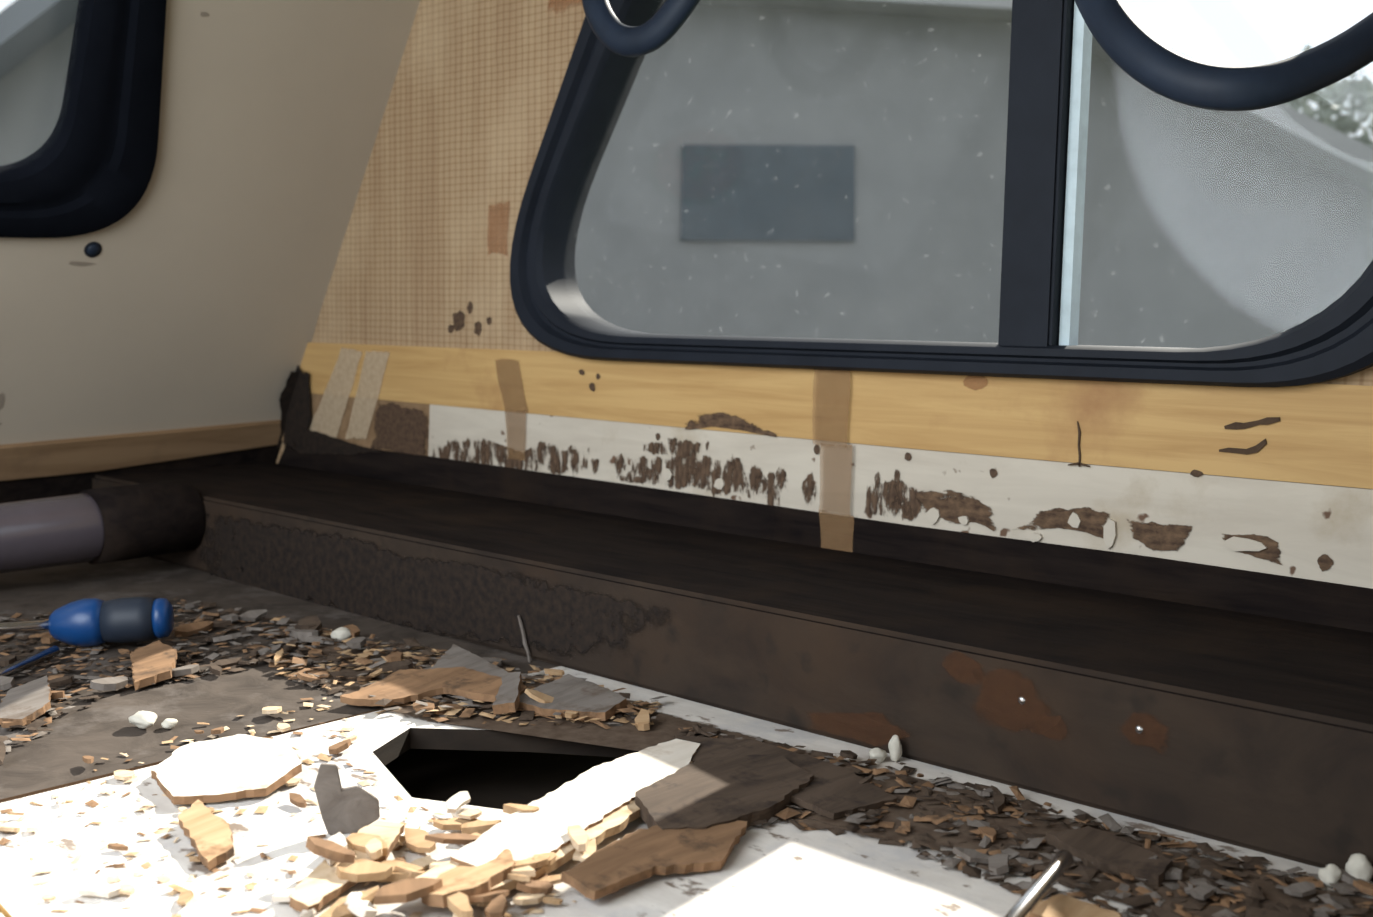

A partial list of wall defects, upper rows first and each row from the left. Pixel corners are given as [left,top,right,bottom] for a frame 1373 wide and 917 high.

peeling [432,438,786,506]
peeling [801,473,816,503]
peeling [865,469,996,531]
peeling [1018,507,1192,551]
peeling [1223,534,1282,565]
peeling [1317,554,1333,571]